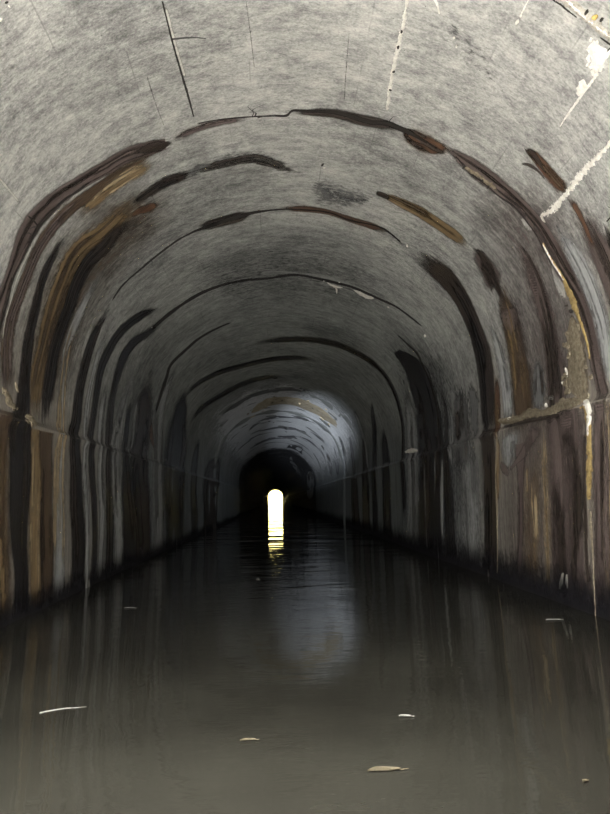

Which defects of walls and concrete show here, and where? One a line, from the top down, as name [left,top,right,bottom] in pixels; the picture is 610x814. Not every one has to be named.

crack [161,0,437,149]
spalling [553,0,610,45]
damp [0,118,610,628]